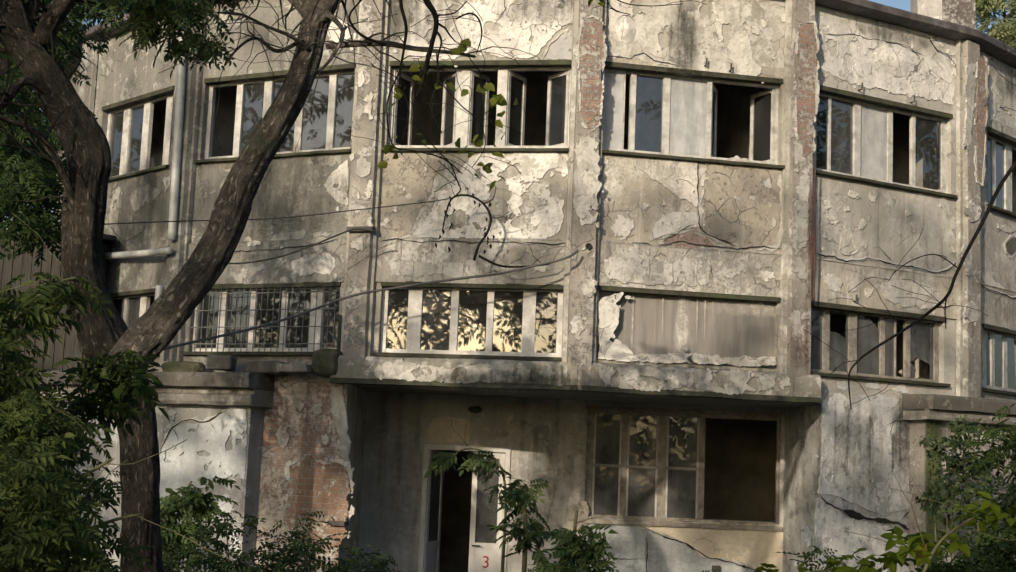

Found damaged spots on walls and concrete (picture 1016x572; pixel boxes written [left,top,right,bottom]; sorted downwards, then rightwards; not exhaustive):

peeling [318,0,766,245]
peeling [783,12,1016,289]
peeling [243,222,337,282]
peeling [384,255,547,281]
spalling [580,155,791,395]
crack [633,167,781,283]
peeling [821,271,948,315]
peeling [367,358,563,386]
peeling [159,406,248,551]
spalling [282,386,355,557]
crack [607,526,754,572]
crack [818,494,909,531]